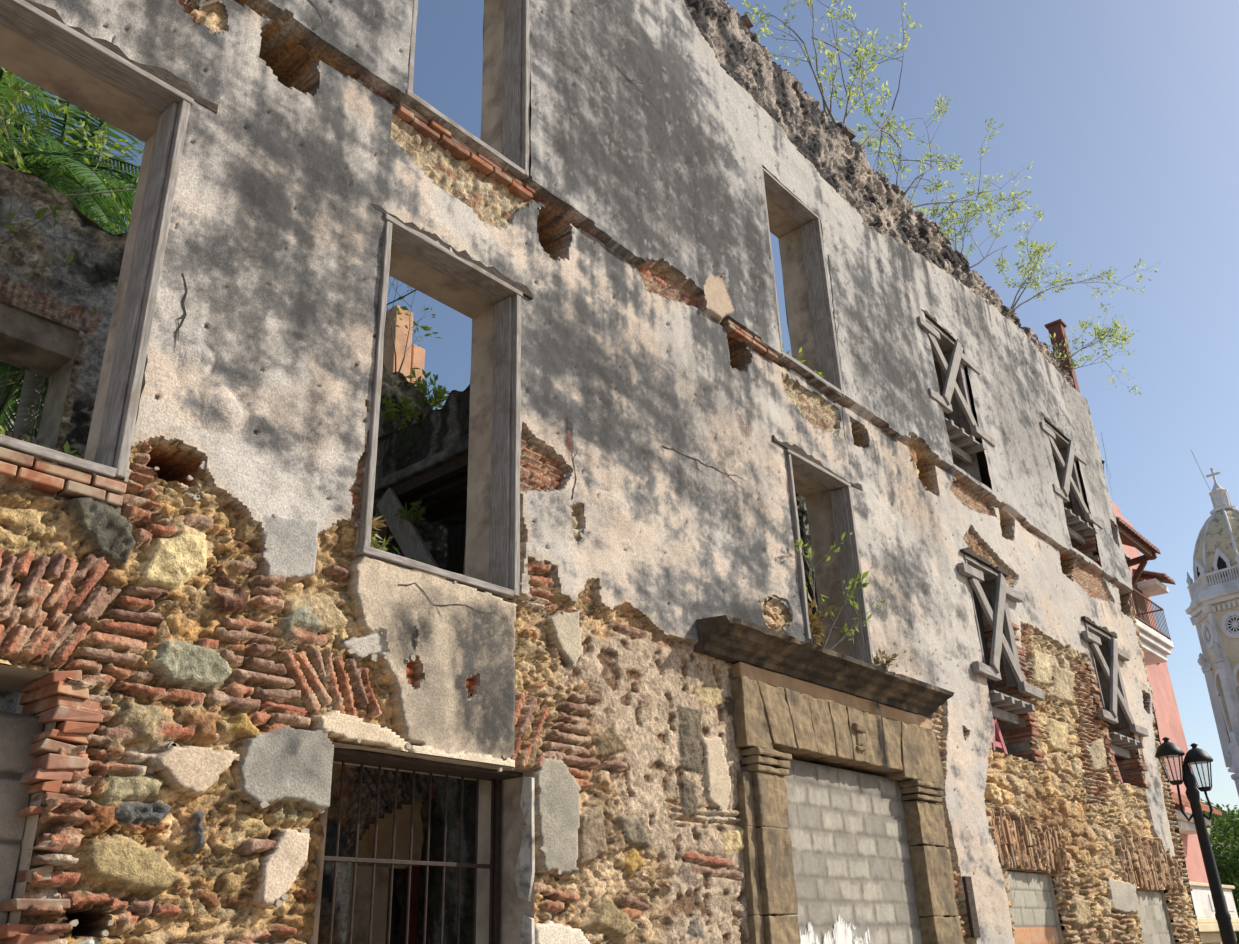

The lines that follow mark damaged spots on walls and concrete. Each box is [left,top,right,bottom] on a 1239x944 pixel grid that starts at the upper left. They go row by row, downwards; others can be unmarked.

spalling [259,8,321,96]
spalling [391,105,573,262]
crack [135,273,188,425]
spalling [636,257,753,373]
peeling [256,513,319,583]
spalling [520,422,573,493]
crack [662,445,759,504]
spalling [903,431,1019,589]
crack [398,583,499,620]
peeling [146,555,590,944]
peeling [702,736,731,815]
spalling [61,901,114,941]